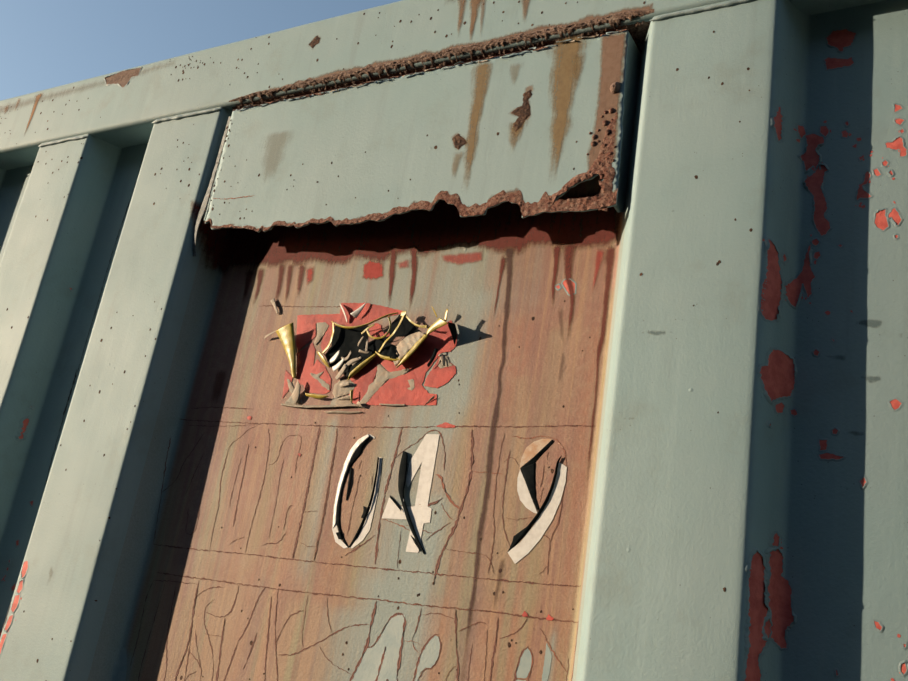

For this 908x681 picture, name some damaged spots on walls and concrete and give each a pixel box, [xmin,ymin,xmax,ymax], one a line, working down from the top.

rust [104,67,142,89]
peeling [758,103,908,323]
peeling [317,303,421,372]
rust [191,0,654,639]
peeling [431,306,457,345]
peeling [757,347,799,429]
crack [154,407,591,587]
peeling [332,422,455,564]
peeling [497,439,567,564]
crack [130,572,578,681]
peeling [741,531,797,681]
peeling [891,634,908,681]